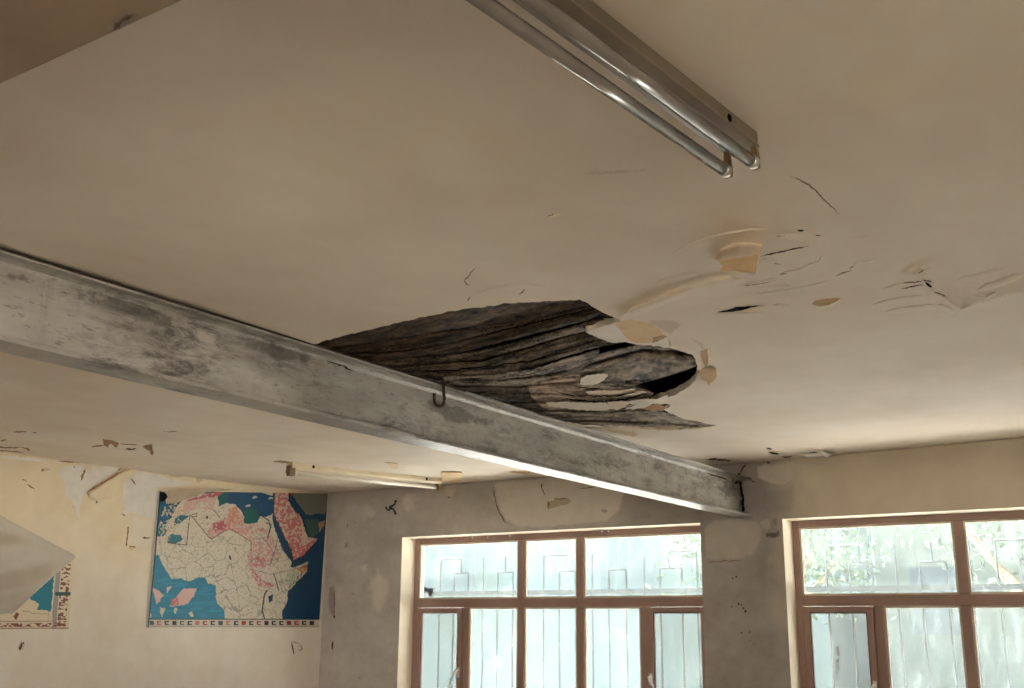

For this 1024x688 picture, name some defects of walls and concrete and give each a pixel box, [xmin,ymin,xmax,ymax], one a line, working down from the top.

crack [791,176,840,215]
crack [744,230,821,286]
peeling [812,298,841,308]
leakage [80,293,322,373]
peeling [586,319,718,386]
leakage [411,393,507,431]
flaking render [545,374,669,411]
peeling [92,439,157,455]
flaking render [0,455,195,550]
leakage [397,488,420,515]
crack [706,458,771,511]